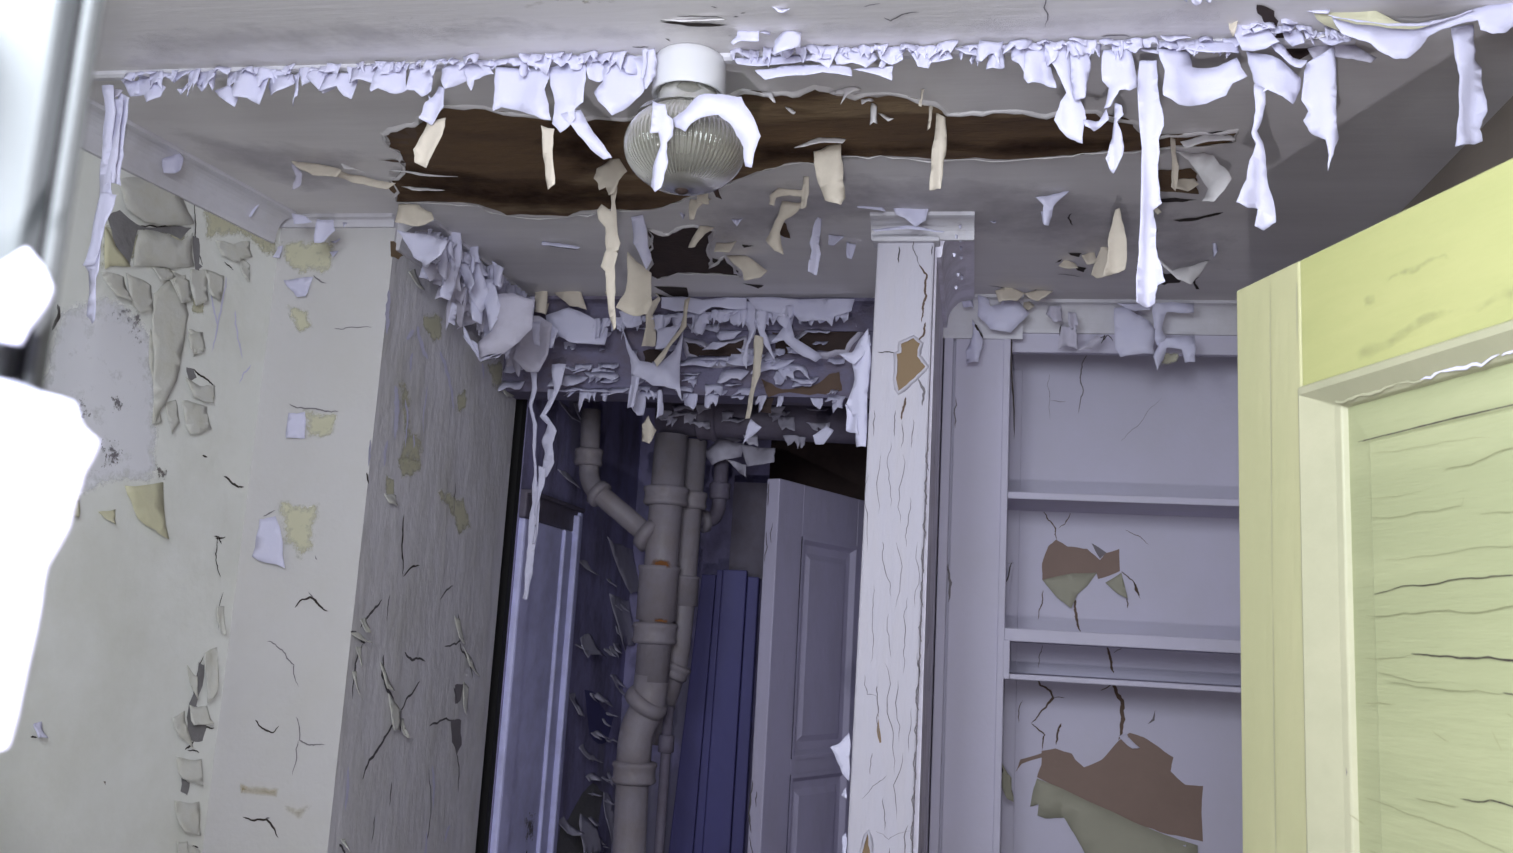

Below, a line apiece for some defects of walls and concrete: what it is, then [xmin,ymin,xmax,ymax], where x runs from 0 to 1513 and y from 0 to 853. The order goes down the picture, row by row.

peeling [121,3,1513,600]
crack [898,242,933,323]
crack [1010,339,1087,434]
crack [1270,281,1298,537]
peeling [172,594,227,853]
crack [255,473,425,853]
spalling [430,615,479,791]
peeling [556,538,639,853]
crack [863,410,952,853]
peeling [1038,512,1141,632]
peeling [1001,681,1203,853]
crack [1346,404,1513,853]